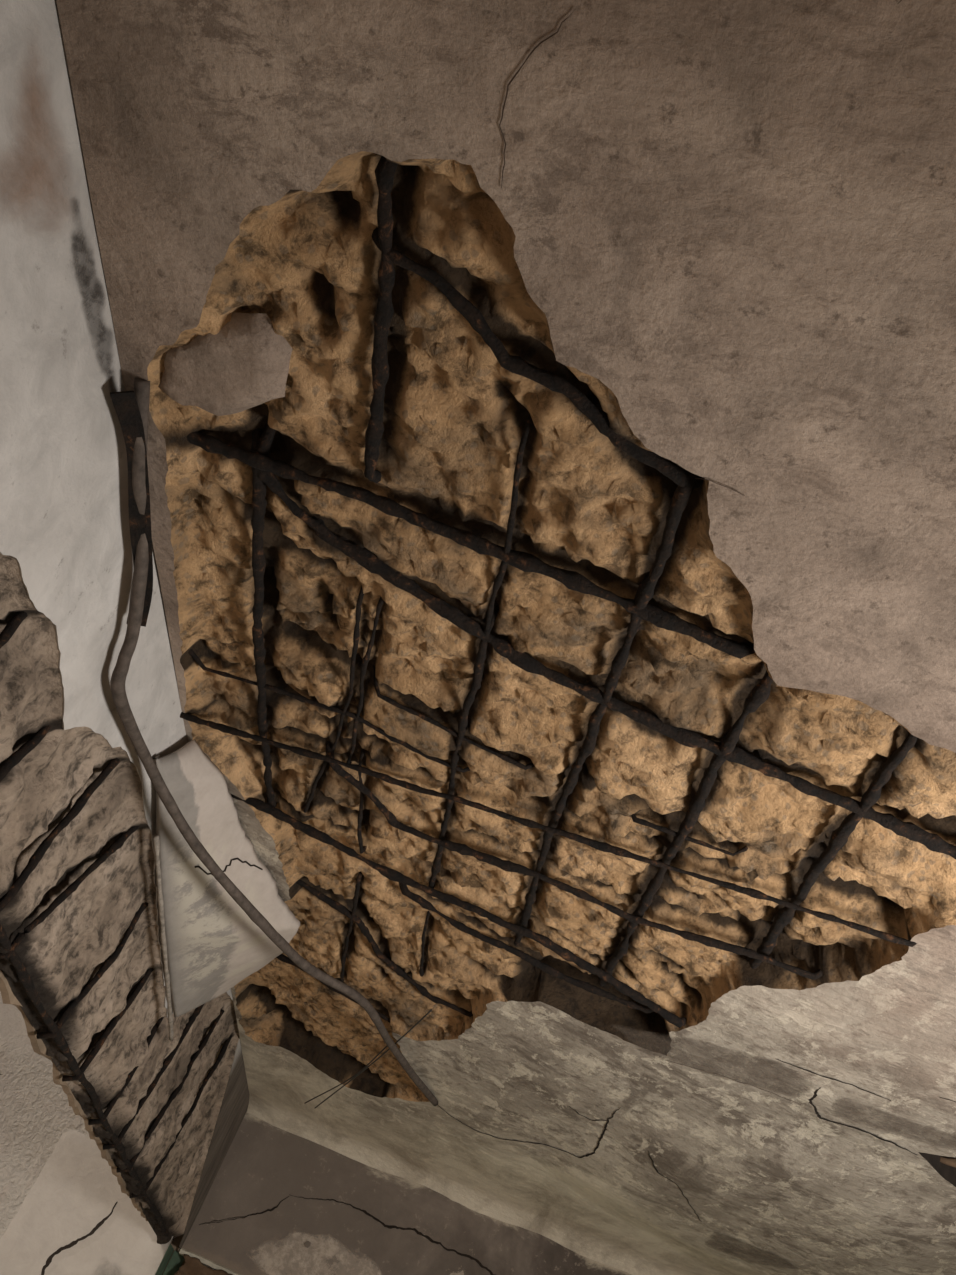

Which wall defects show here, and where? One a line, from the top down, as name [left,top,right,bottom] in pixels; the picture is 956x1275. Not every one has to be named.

spalling [147,151,956,1055]
spalling [0,552,430,1244]
crack [670,1059,917,1155]
crack [41,1202,121,1275]
peeling [252,1232,381,1275]
crack [199,1188,505,1275]